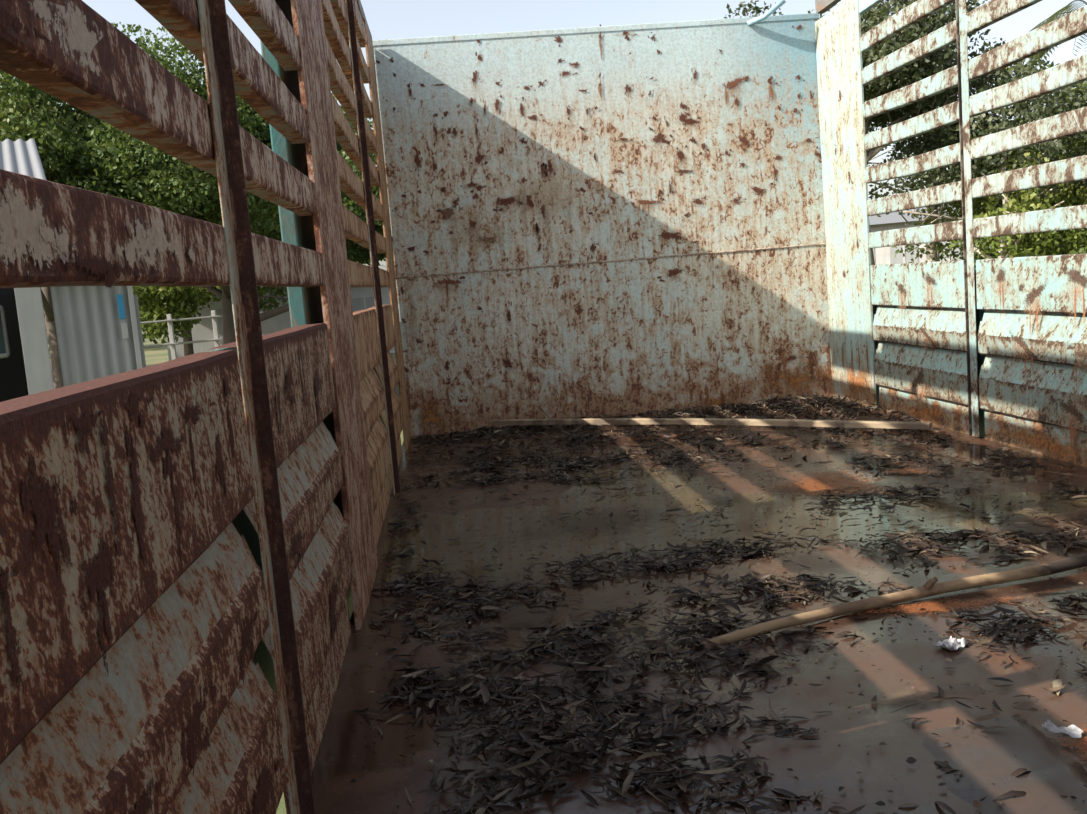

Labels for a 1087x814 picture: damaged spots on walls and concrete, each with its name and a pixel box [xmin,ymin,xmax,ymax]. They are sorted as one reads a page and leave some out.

rust [722,76,749,106]
rust [56,249,160,289]
rust [765,342,869,401]
rust [890,370,961,424]
rust [1004,282,1048,372]
rust [1061,263,1087,325]
rust [123,390,152,594]
rust [151,377,237,569]
rust [12,409,122,678]
rust [0,543,24,695]
rust [234,611,258,686]
rust [177,681,217,778]